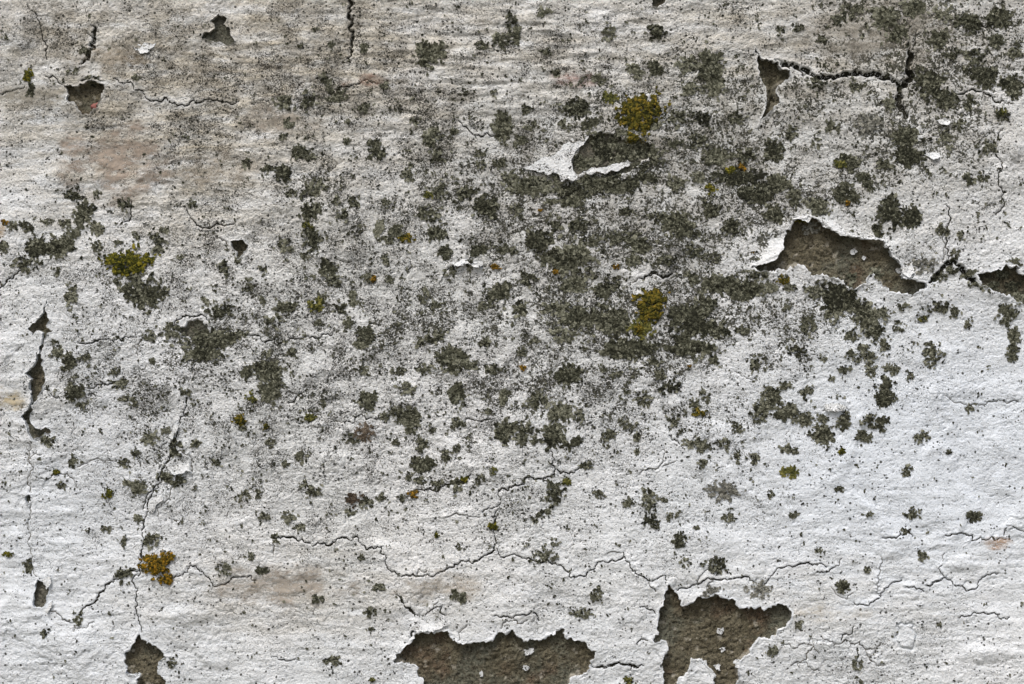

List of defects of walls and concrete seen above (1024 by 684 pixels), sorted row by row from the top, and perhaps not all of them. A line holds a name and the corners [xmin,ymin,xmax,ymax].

spalling [200,12,236,47]
crack [347,0,355,59]
crack [766,31,917,120]
peeling [524,133,648,181]
spalling [748,214,929,297]
spalling [19,299,54,446]
crack [27,443,112,577]
crack [46,397,193,631]
crack [272,451,1023,671]
spalling [122,632,168,684]
spalling [390,626,598,684]
spalling [648,581,794,684]